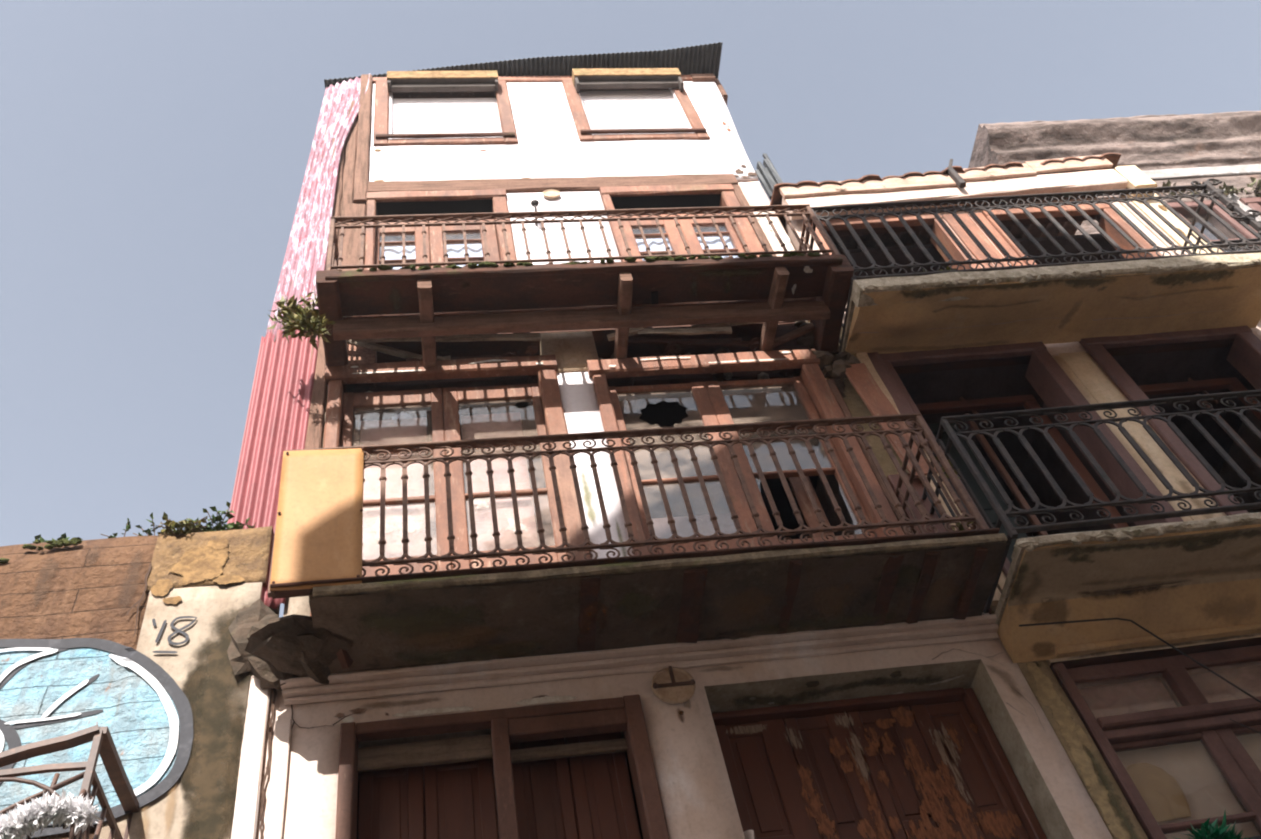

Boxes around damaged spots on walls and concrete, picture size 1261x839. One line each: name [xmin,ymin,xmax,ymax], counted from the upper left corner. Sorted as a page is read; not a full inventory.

damp [902,279,1115,298]
damp [1153,270,1234,286]
damp [1053,530,1261,563]
damp [1082,581,1185,598]
damp [702,613,946,640]
damp [364,645,539,671]
damp [181,606,252,839]
peeling [726,724,767,734]
peeling [829,692,1022,839]
peeling [783,726,840,839]